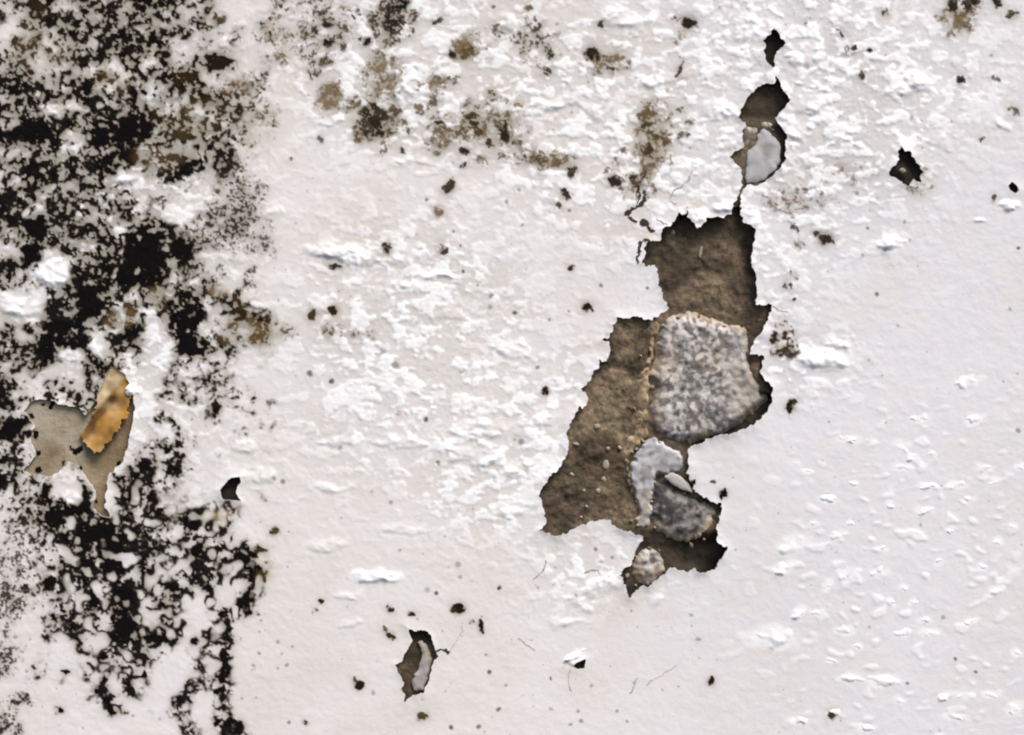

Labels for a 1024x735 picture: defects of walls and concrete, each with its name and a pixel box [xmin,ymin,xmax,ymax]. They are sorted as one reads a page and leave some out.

mould [255,0,577,208]
mould [584,47,631,72]
mould [605,102,693,198]
water stain [674,16,697,28]
peeling [889,147,923,186]
peeling [539,29,790,598]
mould [0,0,293,735]
peeling [24,366,135,517]
hole [220,477,241,501]
peeling [396,629,439,702]